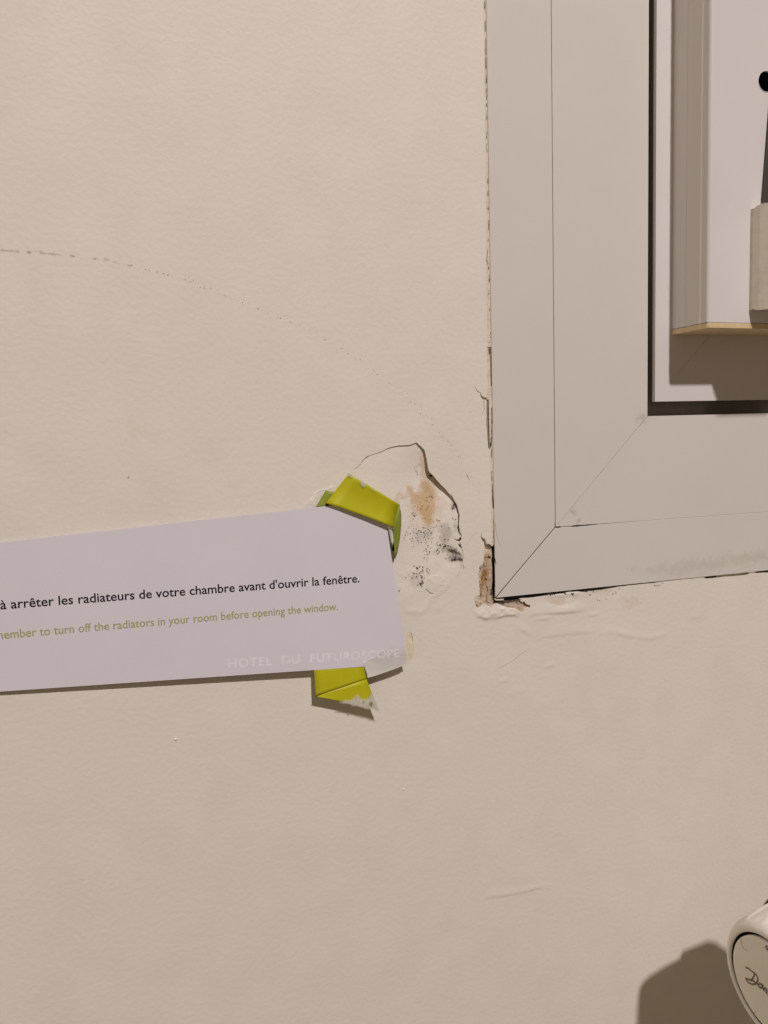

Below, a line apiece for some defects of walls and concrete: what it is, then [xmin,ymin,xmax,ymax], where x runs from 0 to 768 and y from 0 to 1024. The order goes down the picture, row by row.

peeling [356,443,464,602]
water stain [404,494,463,587]
flaking render [474,537,530,612]